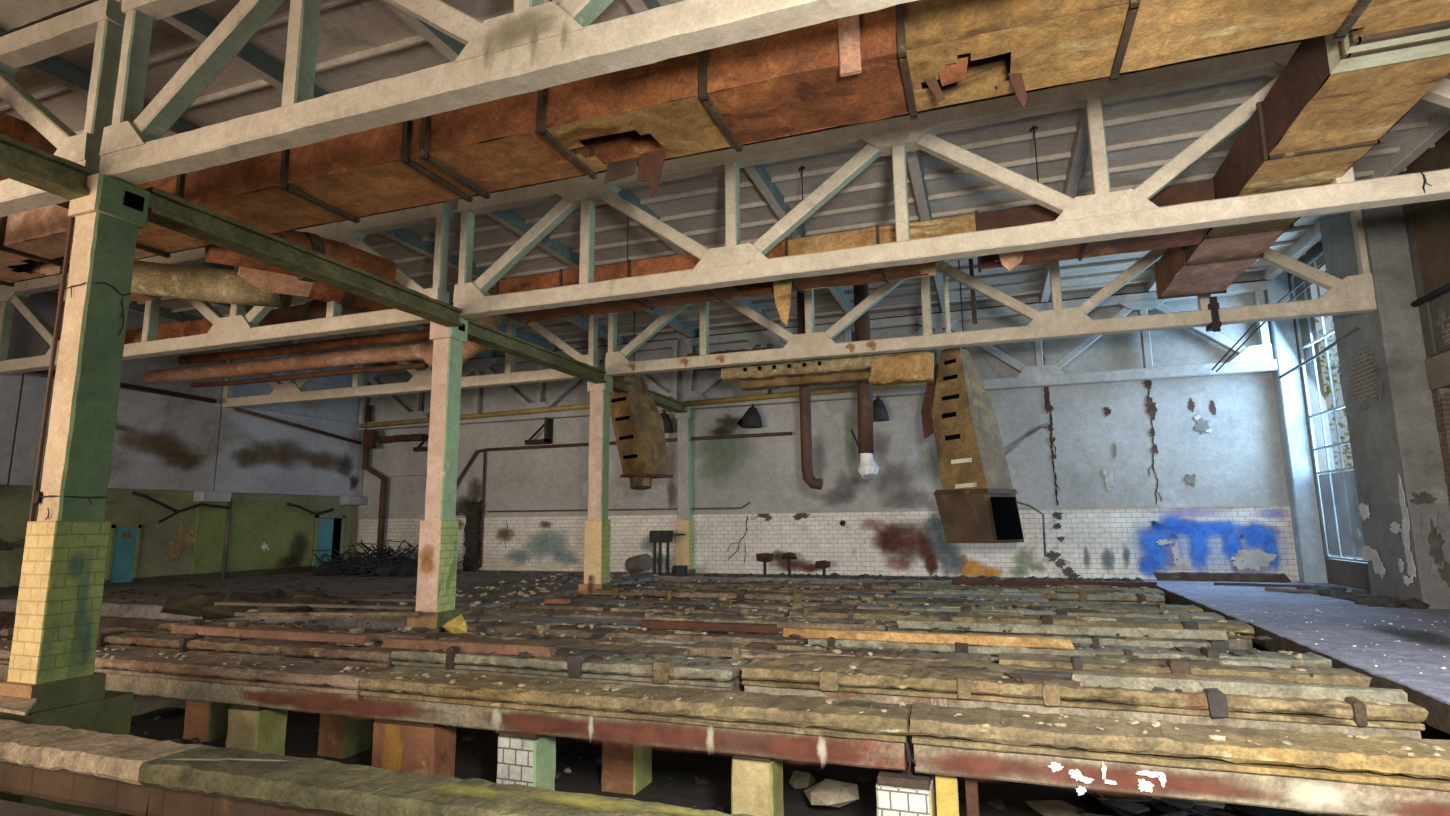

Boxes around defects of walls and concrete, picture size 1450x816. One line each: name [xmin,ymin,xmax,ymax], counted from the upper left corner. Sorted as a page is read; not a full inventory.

damp [115,425,198,469]
damp [236,444,336,468]
flaking render [1355,474,1450,587]
rust [421,547,432,572]